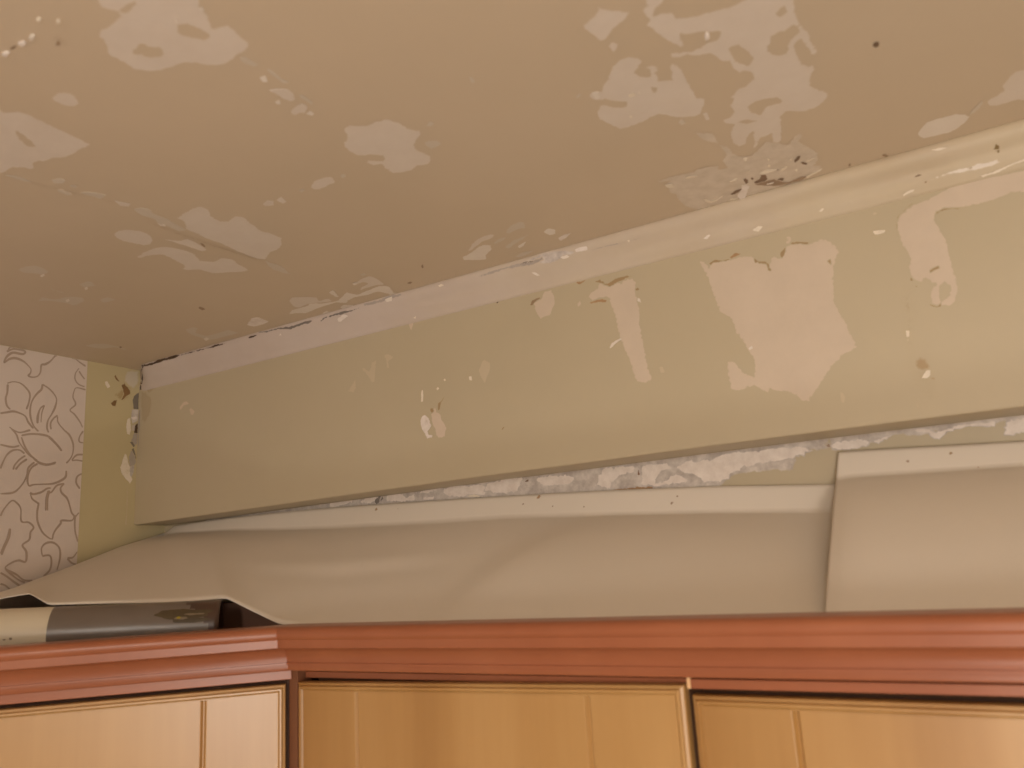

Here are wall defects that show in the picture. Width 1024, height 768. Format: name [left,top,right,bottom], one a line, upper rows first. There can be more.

peeling [0,109,92,173]
peeling [97,0,314,116]
peeling [343,119,442,174]
peeling [576,0,828,211]
peeling [917,69,1024,151]
peeling [113,206,283,274]
peeling [873,159,1024,308]
crack [139,293,402,391]
peeling [576,275,652,383]
peeling [699,236,857,402]
spalling [120,369,141,483]
spalling [204,415,1024,521]